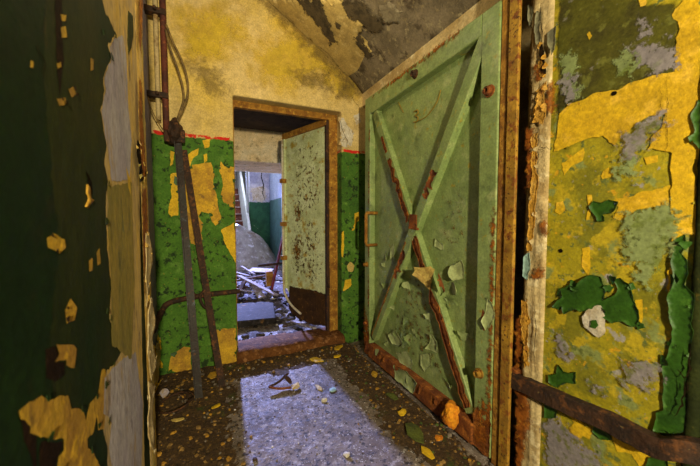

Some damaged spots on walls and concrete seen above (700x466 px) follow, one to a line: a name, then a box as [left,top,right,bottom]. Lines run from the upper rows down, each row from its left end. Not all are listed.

leakage [259,0,361,97]
peeling [268,0,372,76]
leakage [341,0,389,59]
peeling [0,0,192,466]
peeling [168,139,236,263]
rust [381,136,409,223]
rust [525,128,534,188]
peeling [548,0,700,438]
rust [363,236,425,354]
peeling [217,328,238,364]
rust [429,286,495,460]
rust [514,392,533,466]